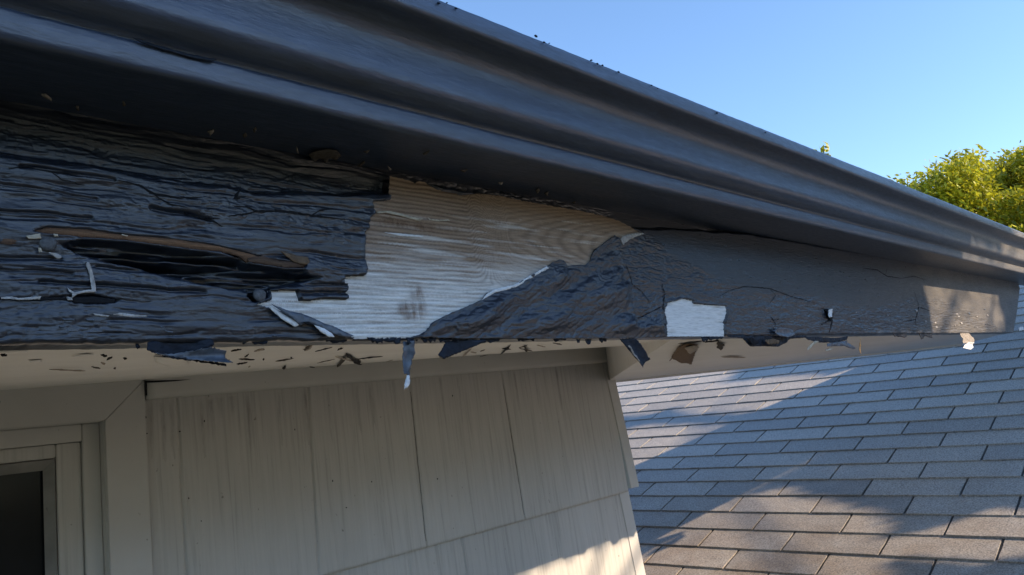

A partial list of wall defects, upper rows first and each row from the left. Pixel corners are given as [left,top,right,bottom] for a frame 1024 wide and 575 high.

peeling [26,233,61,259]
peeling [135,166,644,390]
peeling [59,313,147,328]
peeling [665,299,861,365]
peeling [0,350,127,372]